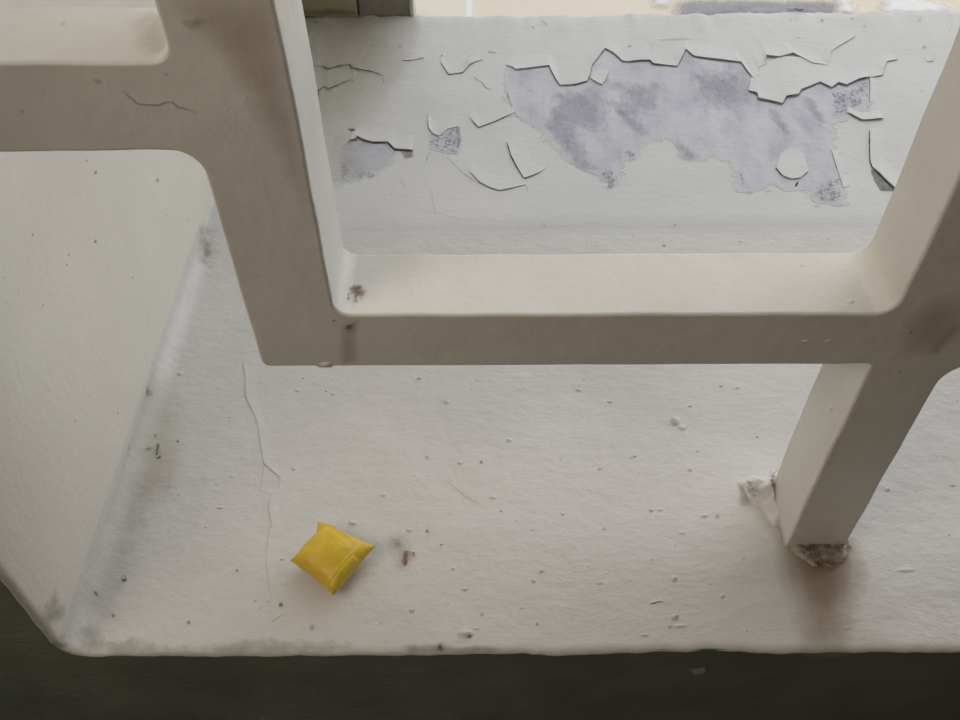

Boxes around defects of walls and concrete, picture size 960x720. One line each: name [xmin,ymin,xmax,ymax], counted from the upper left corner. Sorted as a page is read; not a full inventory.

crack [124,92,194,113]
peeling [343,121,413,180]
spalling [428,112,463,154]
peeling [503,39,900,207]
spalling [787,541,851,572]